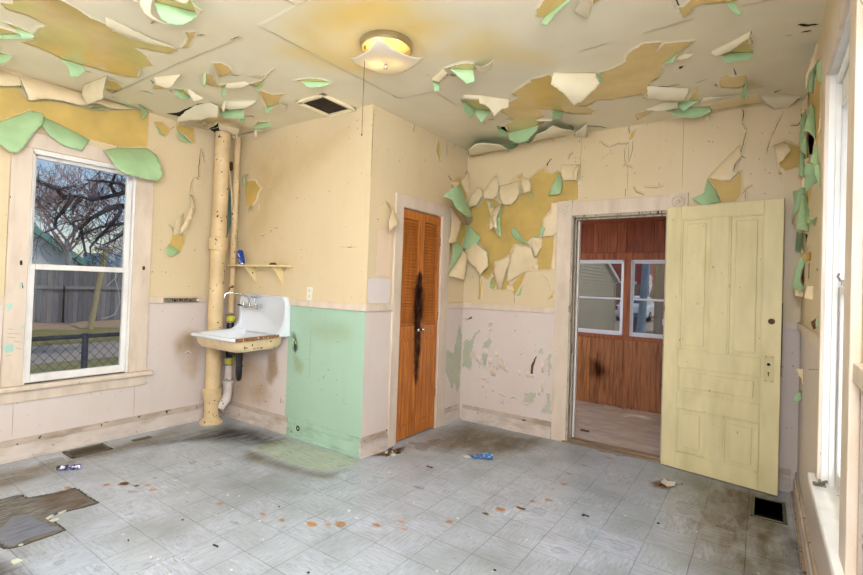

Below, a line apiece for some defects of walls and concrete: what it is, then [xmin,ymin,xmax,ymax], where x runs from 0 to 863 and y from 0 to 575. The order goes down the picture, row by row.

peeling [533,0,601,25]
peeling [671,0,742,19]
peeling [0,0,288,256]
peeling [435,137,581,304]
peeling [426,31,766,156]
crack [599,126,663,196]
peeling [692,145,753,205]
crack [734,108,802,171]
peeling [773,39,822,300]
damp [414,273,422,381]
peeling [445,315,553,415]
peeling [0,488,100,564]